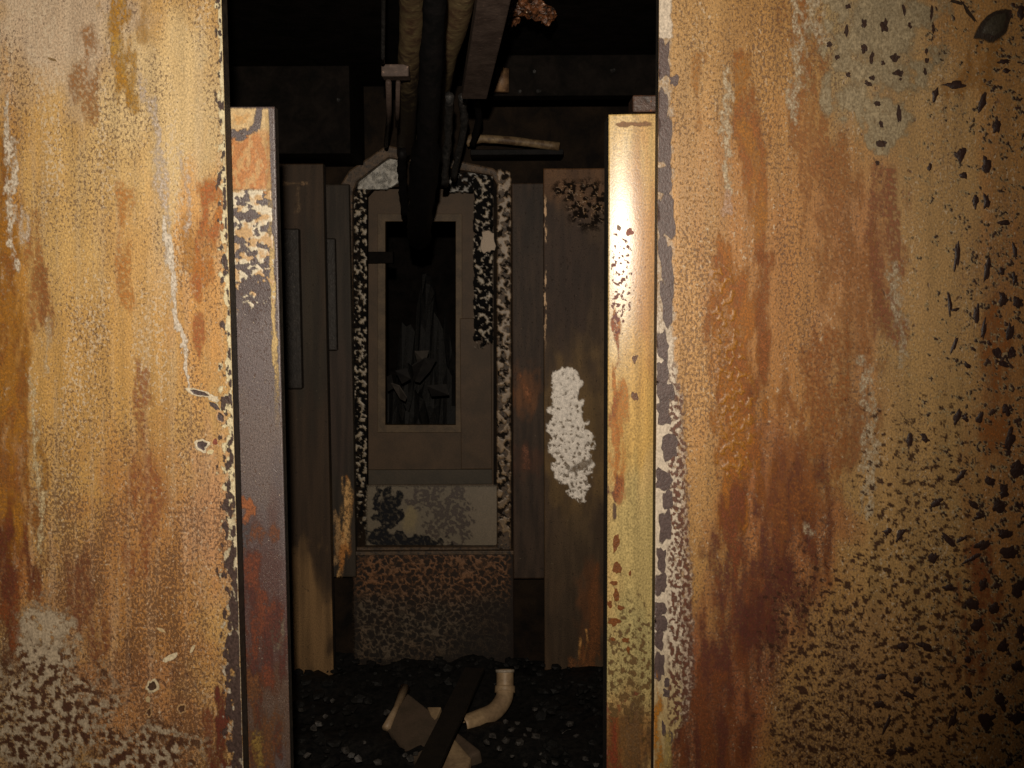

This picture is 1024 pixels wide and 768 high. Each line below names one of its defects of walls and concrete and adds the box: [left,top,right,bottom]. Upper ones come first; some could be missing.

corrosion [109,0,147,114]
peeling [786,0,954,166]
peeling [185,0,308,768]
corrosion [608,368,628,519]
corrosion [611,225,634,351]
peeling [654,0,685,768]
corrosion [704,51,784,579]
peeling [856,355,879,520]
corrosion [0,498,41,689]
peeling [0,595,210,768]
corrosion [241,496,288,768]
corrosion [569,565,672,768]